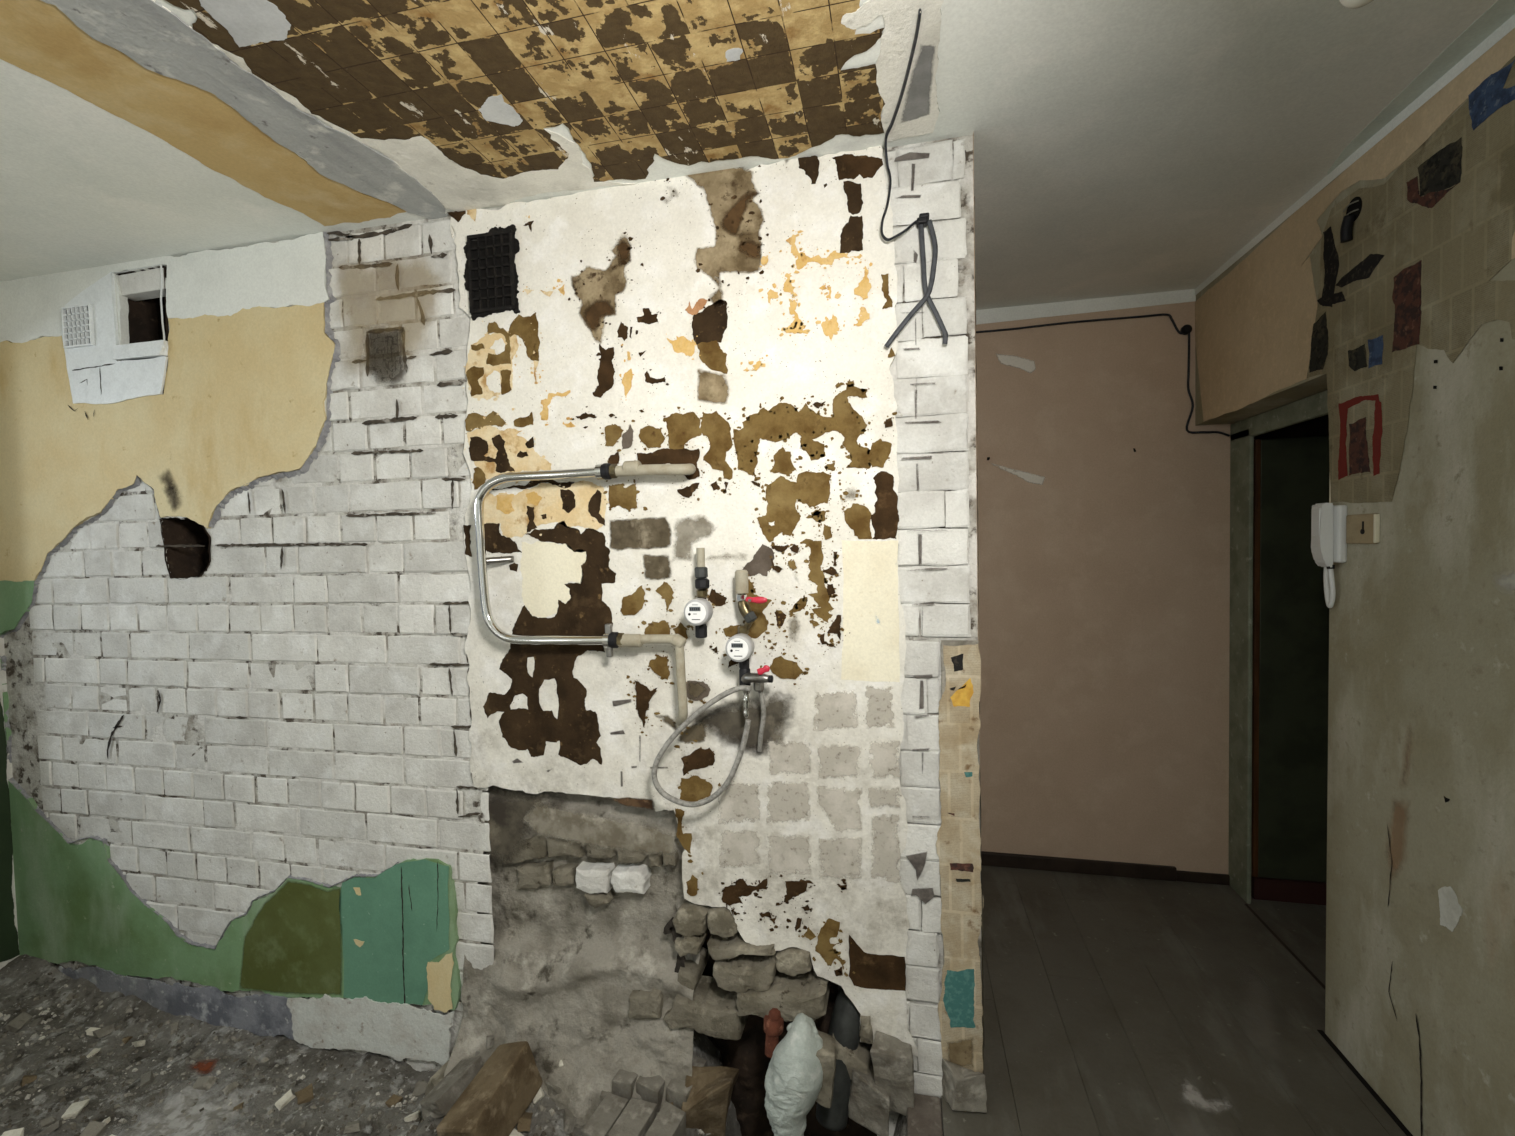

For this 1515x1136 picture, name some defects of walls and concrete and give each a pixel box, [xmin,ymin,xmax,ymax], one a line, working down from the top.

spalling [199,0,291,47]
spalling [841,0,882,30]
spalling [479,94,523,127]
peeling [617,323,666,384]
peeling [696,340,728,403]
flaking render [0,209,605,1013]
peeling [621,582,688,640]
peeling [704,589,727,606]
peeling [712,625,750,668]
flaking render [770,138,971,1098]
peeling [635,656,715,802]
spalling [664,875,877,1136]